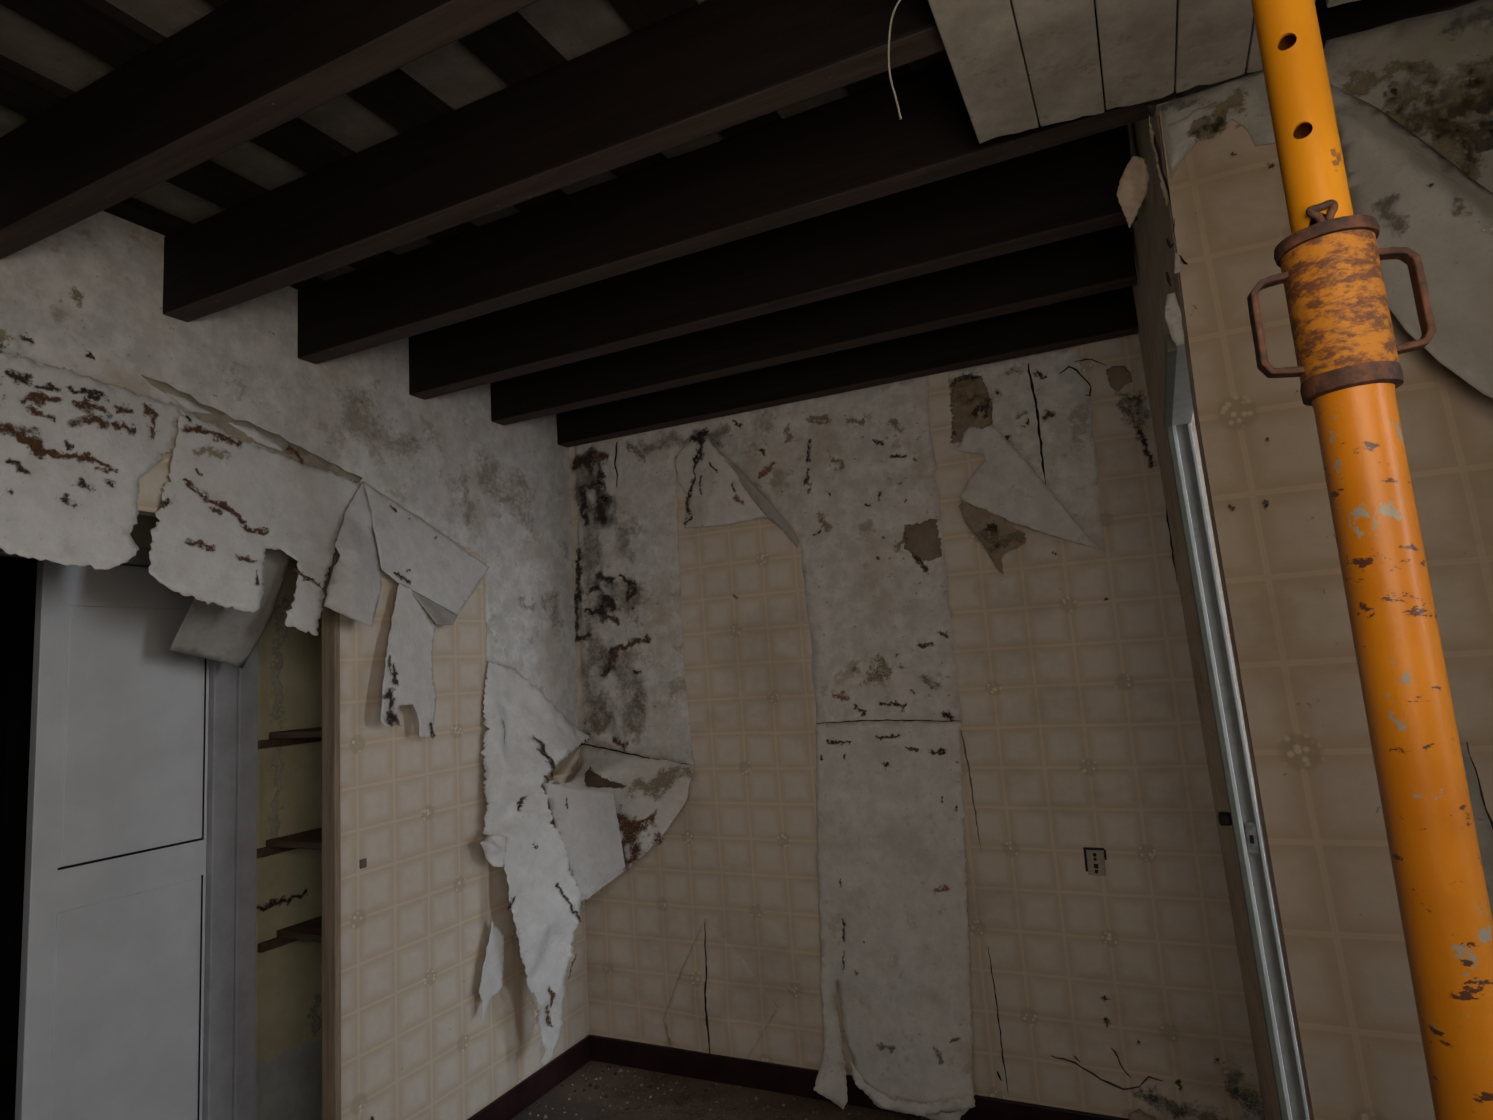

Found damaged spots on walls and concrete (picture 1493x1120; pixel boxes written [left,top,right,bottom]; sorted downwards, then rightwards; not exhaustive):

peeling [1148,70,1276,207]
peeling [1323,0,1493,193]
leakage [1343,56,1493,180]
leakage [1375,194,1407,232]
peeling [1106,366,1132,392]
spalling [1165,293,1184,347]
peeling [0,211,962,766]
leakage [572,445,609,526]
peeling [948,346,1105,552]
leakage [574,548,651,677]
leakage [579,713,628,752]
crack [1467,742,1493,829]